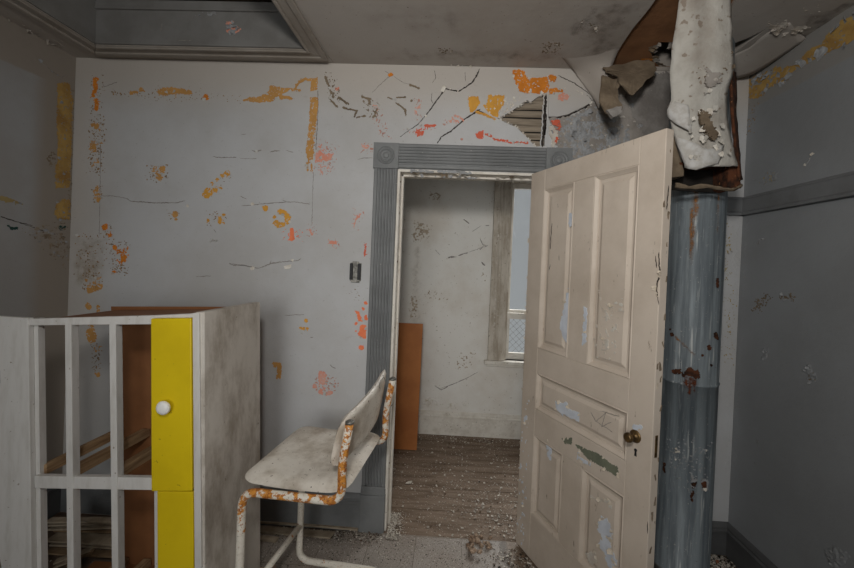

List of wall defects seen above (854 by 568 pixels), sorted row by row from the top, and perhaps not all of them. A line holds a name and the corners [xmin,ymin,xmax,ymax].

peeling [87,69,569,203]
crack [400,64,480,137]
crack [437,109,484,143]
crack [540,75,593,147]
flaking render [548,0,679,159]
peeling [688,105,732,161]
peeling [746,12,854,135]
peeling [7,82,129,312]
peeling [262,205,317,242]
crack [230,258,302,269]
peeling [86,325,102,377]
rust [672,367,700,394]